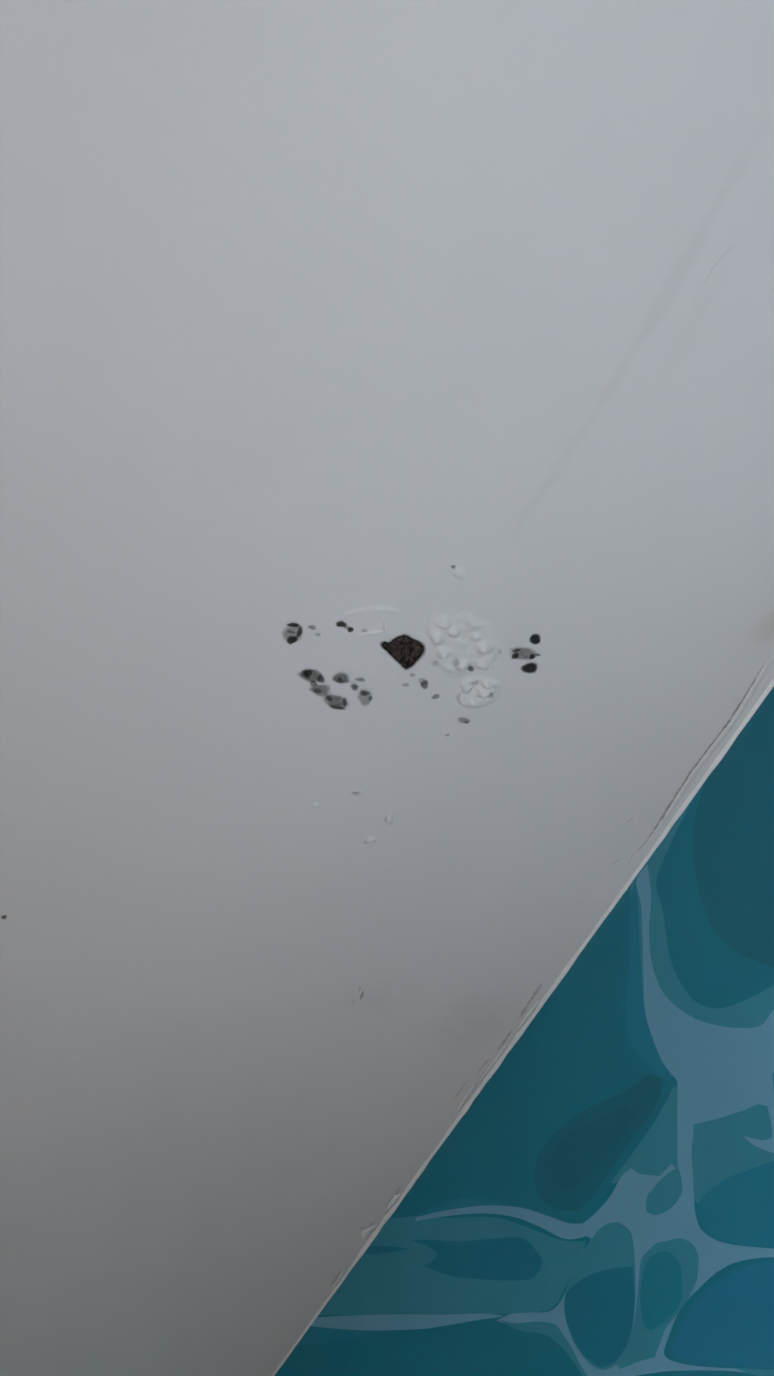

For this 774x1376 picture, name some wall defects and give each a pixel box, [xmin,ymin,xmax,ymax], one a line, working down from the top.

leakage [287,623,302,644]
spalling [381,634,425,670]
leakage [512,634,540,673]
leakage [300,670,372,709]